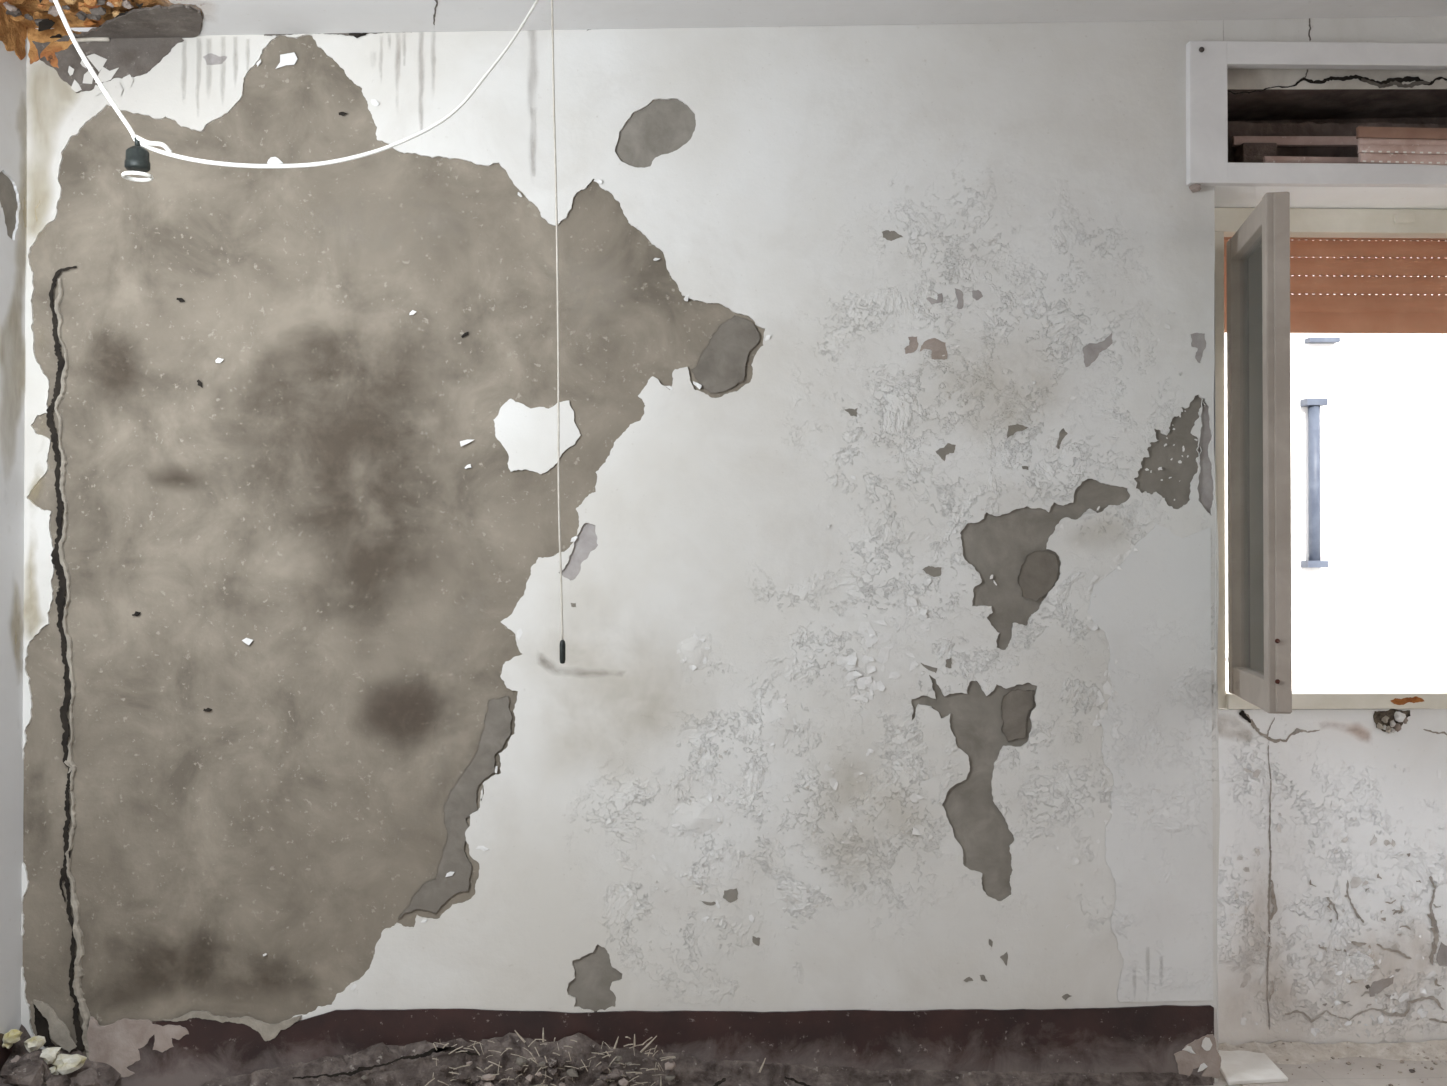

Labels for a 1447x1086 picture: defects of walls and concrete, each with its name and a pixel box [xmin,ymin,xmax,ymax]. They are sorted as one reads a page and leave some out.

rust [27,28,81,68]
crack [1227,18,1447,94]
leakage [292,373,407,528]
leakage [347,529,400,592]
flaking render [0,0,771,1079]
peeling [922,566,942,577]
flaking render [960,395,1214,650]
crack [46,266,91,1059]
leakage [372,691,428,735]
flaking render [824,597,1037,901]
crack [1239,710,1447,1030]